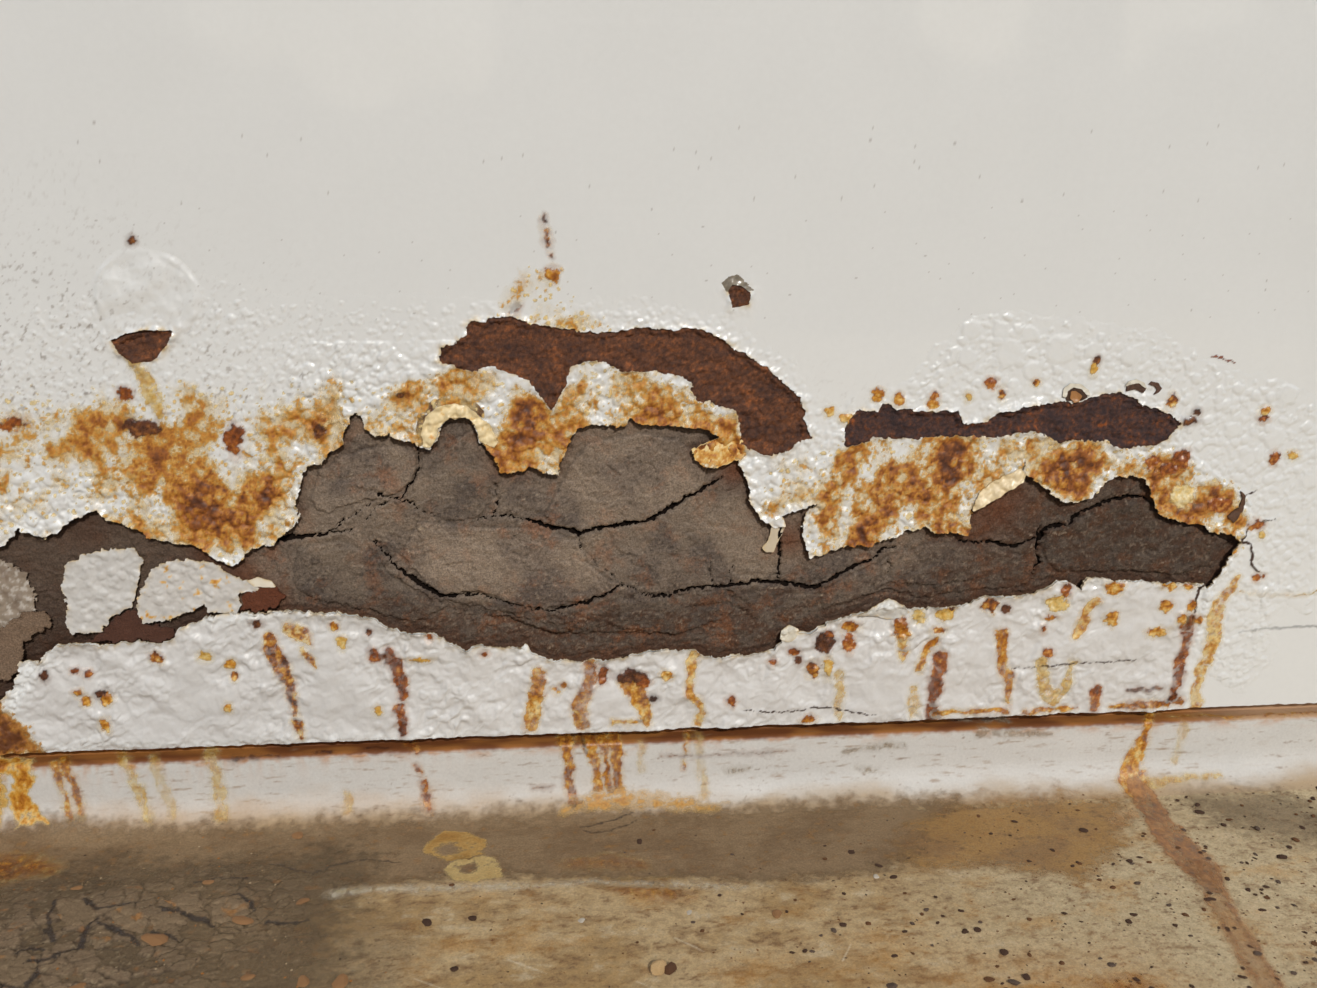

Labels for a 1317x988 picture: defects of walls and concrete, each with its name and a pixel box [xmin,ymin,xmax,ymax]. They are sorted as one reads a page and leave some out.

rust [0,360,746,565]
crack [262,447,895,623]
peeling [0,316,1246,700]
rust [761,432,1265,555]
crack [958,494,1144,579]
crack [1241,492,1276,572]
rust [0,702,82,826]
rust [252,620,317,740]
rust [366,629,432,810]
rust [524,650,716,814]
rust [769,621,859,699]
rust [894,574,1283,988]